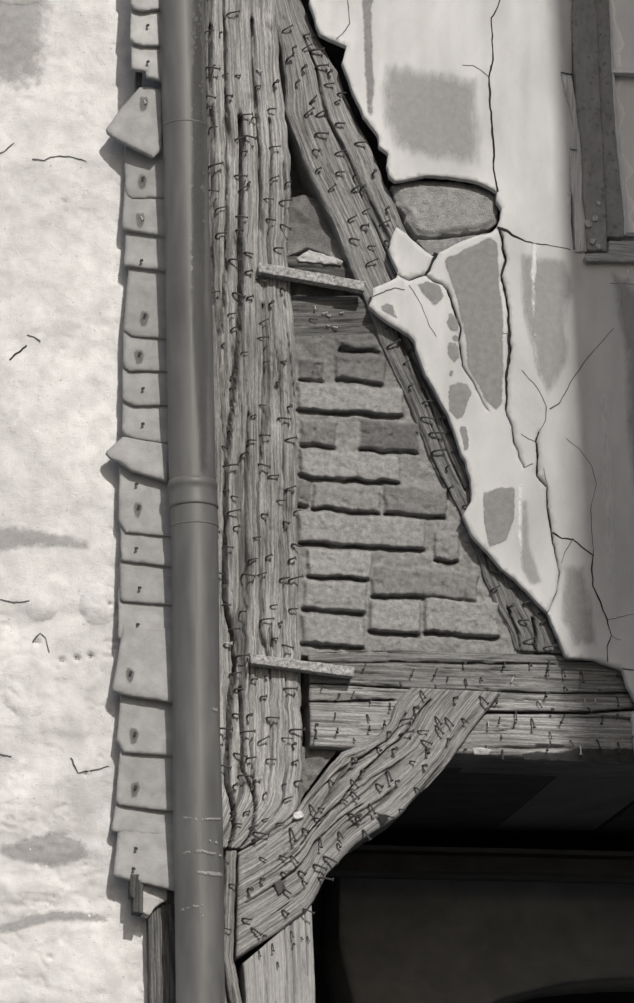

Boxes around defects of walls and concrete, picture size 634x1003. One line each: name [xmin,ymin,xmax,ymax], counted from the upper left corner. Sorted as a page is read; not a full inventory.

damp [363,0,374,113]
damp [388,70,473,156]
spalling [389,180,498,255]
crack [462,0,500,192]
peeling [561,72,602,253]
crack [373,252,471,380]
crack [497,226,634,671]